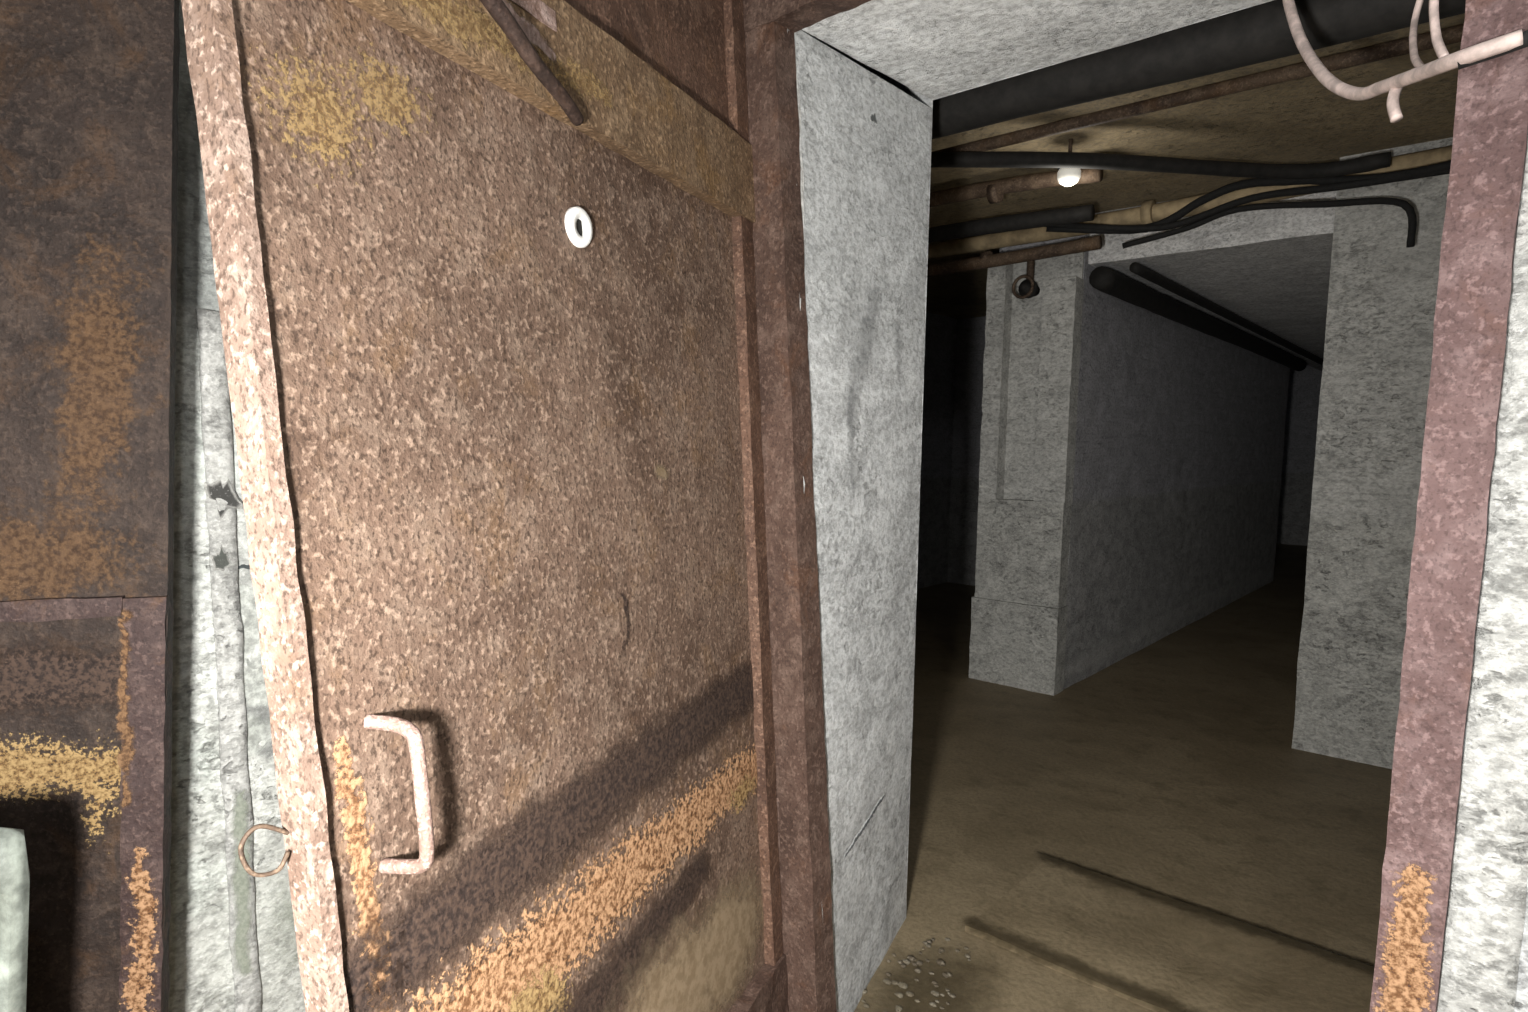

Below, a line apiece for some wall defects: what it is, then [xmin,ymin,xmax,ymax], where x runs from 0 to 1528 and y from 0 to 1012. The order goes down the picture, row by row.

corrosion [1373,863,1438,1012]